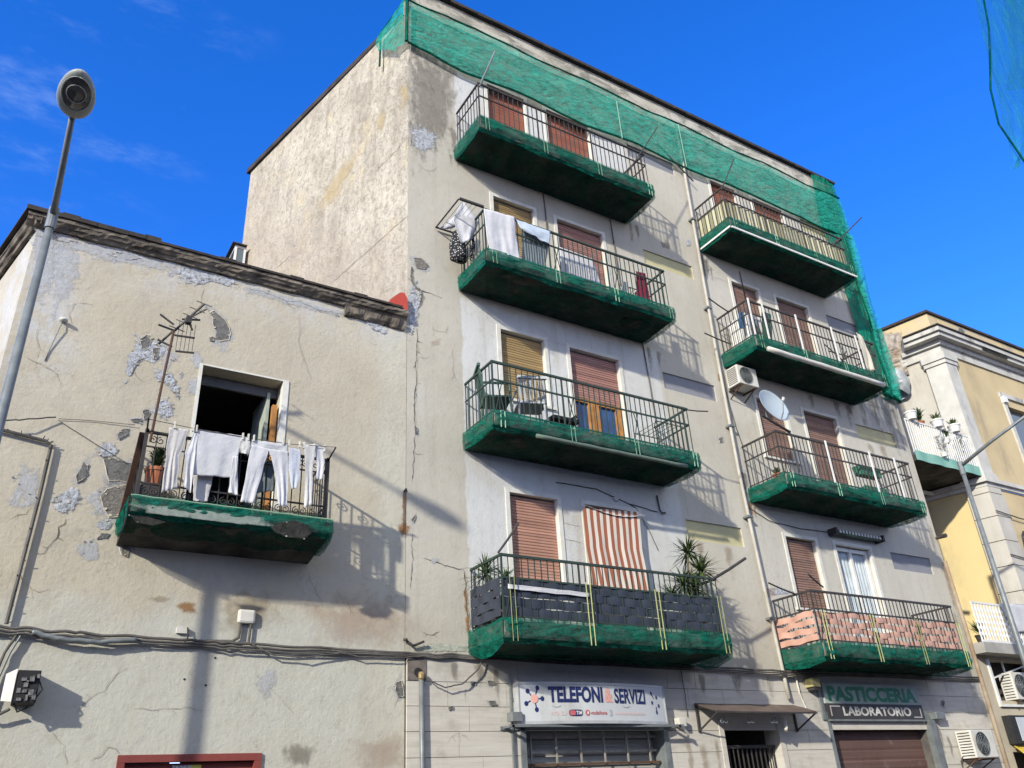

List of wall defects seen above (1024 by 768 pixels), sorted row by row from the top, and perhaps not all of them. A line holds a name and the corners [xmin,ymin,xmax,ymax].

peeling [410,125,438,152]
spalling [205,305,234,351]
peeling [50,334,312,560]
peeling [8,465,38,507]